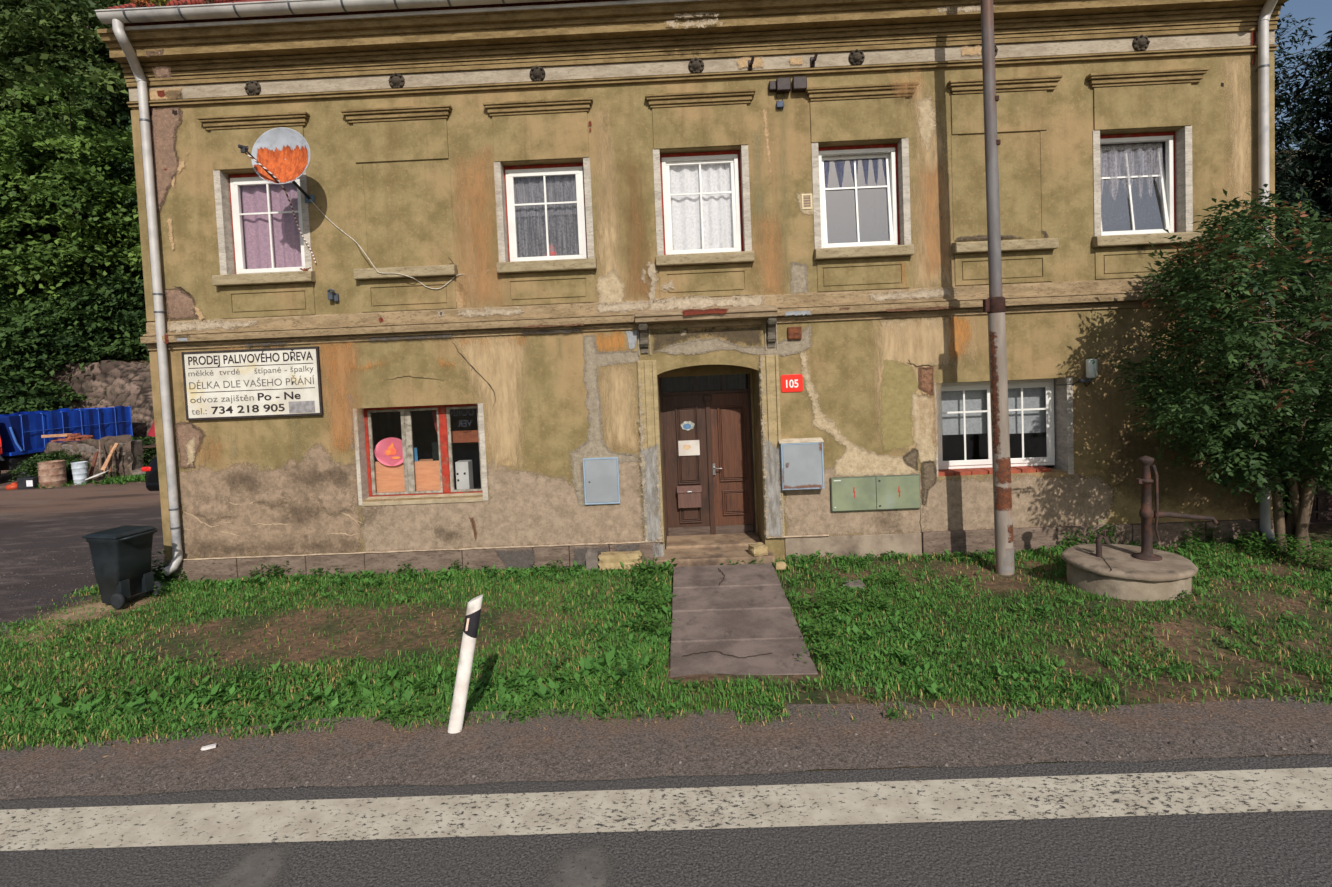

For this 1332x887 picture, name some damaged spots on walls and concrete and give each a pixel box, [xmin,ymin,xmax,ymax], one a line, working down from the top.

spalling [146,49,186,249]
peeling [870,286,959,301]
flaking render [175,336,663,559]
flaking render [758,316,994,540]
flaking render [1011,473,1117,528]